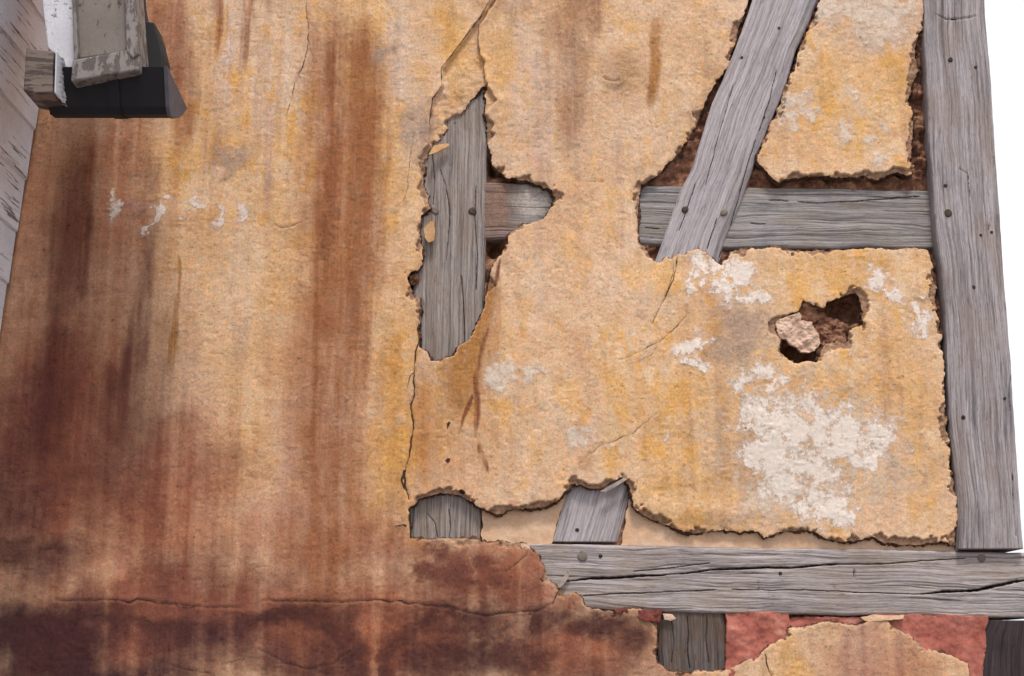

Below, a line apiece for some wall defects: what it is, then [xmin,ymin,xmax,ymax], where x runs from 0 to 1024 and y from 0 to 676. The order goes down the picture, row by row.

peeling [754,0,924,187]
spalling [637,0,749,262]
damp [108,188,171,237]
damp [211,201,248,230]
spalling [407,82,556,361]
peeling [685,245,853,308]
crack [396,315,420,531]
peeling [408,263,957,567]
damp [414,546,502,586]
crack [61,598,235,608]
damp [378,603,496,676]
damp [527,609,645,644]